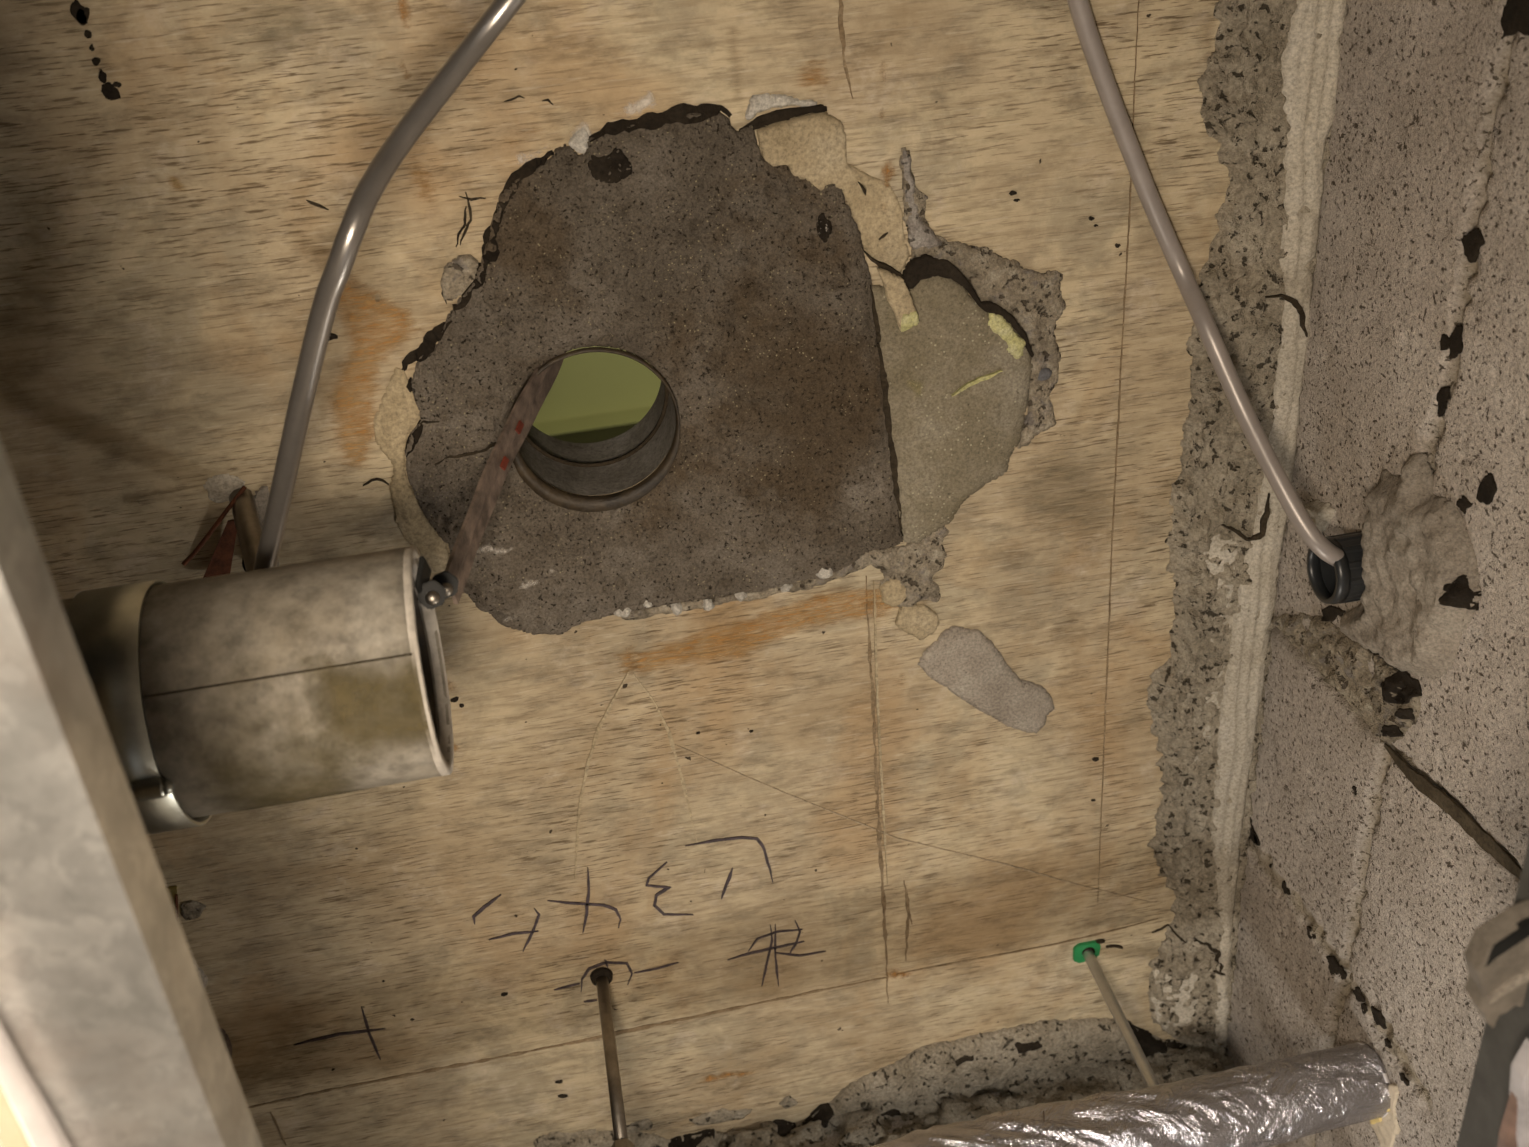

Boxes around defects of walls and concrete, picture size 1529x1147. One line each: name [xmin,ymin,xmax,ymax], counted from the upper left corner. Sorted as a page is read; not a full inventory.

flaking render [440,254,478,301]
spalling [756,112,1066,449]
flaking render [373,367,449,573]
spalling [614,527,949,640]